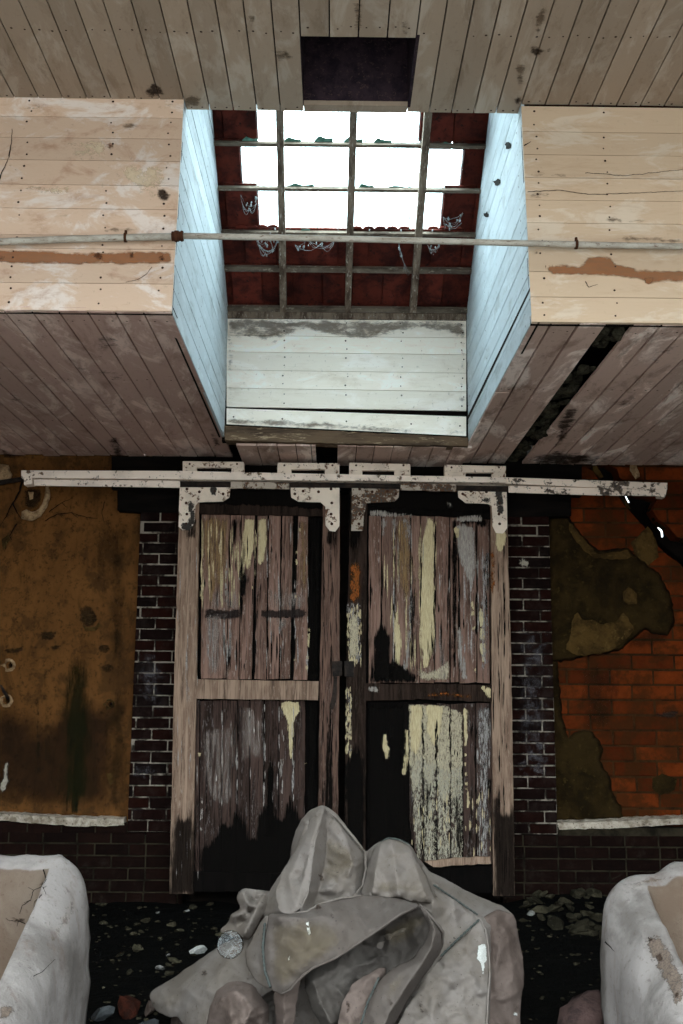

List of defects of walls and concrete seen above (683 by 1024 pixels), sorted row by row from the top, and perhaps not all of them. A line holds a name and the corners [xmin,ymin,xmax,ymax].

crack [529,169,683,195]
crack [0,482,105,552]
peeling [181,501,267,670]
peeling [270,521,307,626]
flaking render [549,517,677,820]
damp [0,706,114,799]
peeling [402,686,491,860]